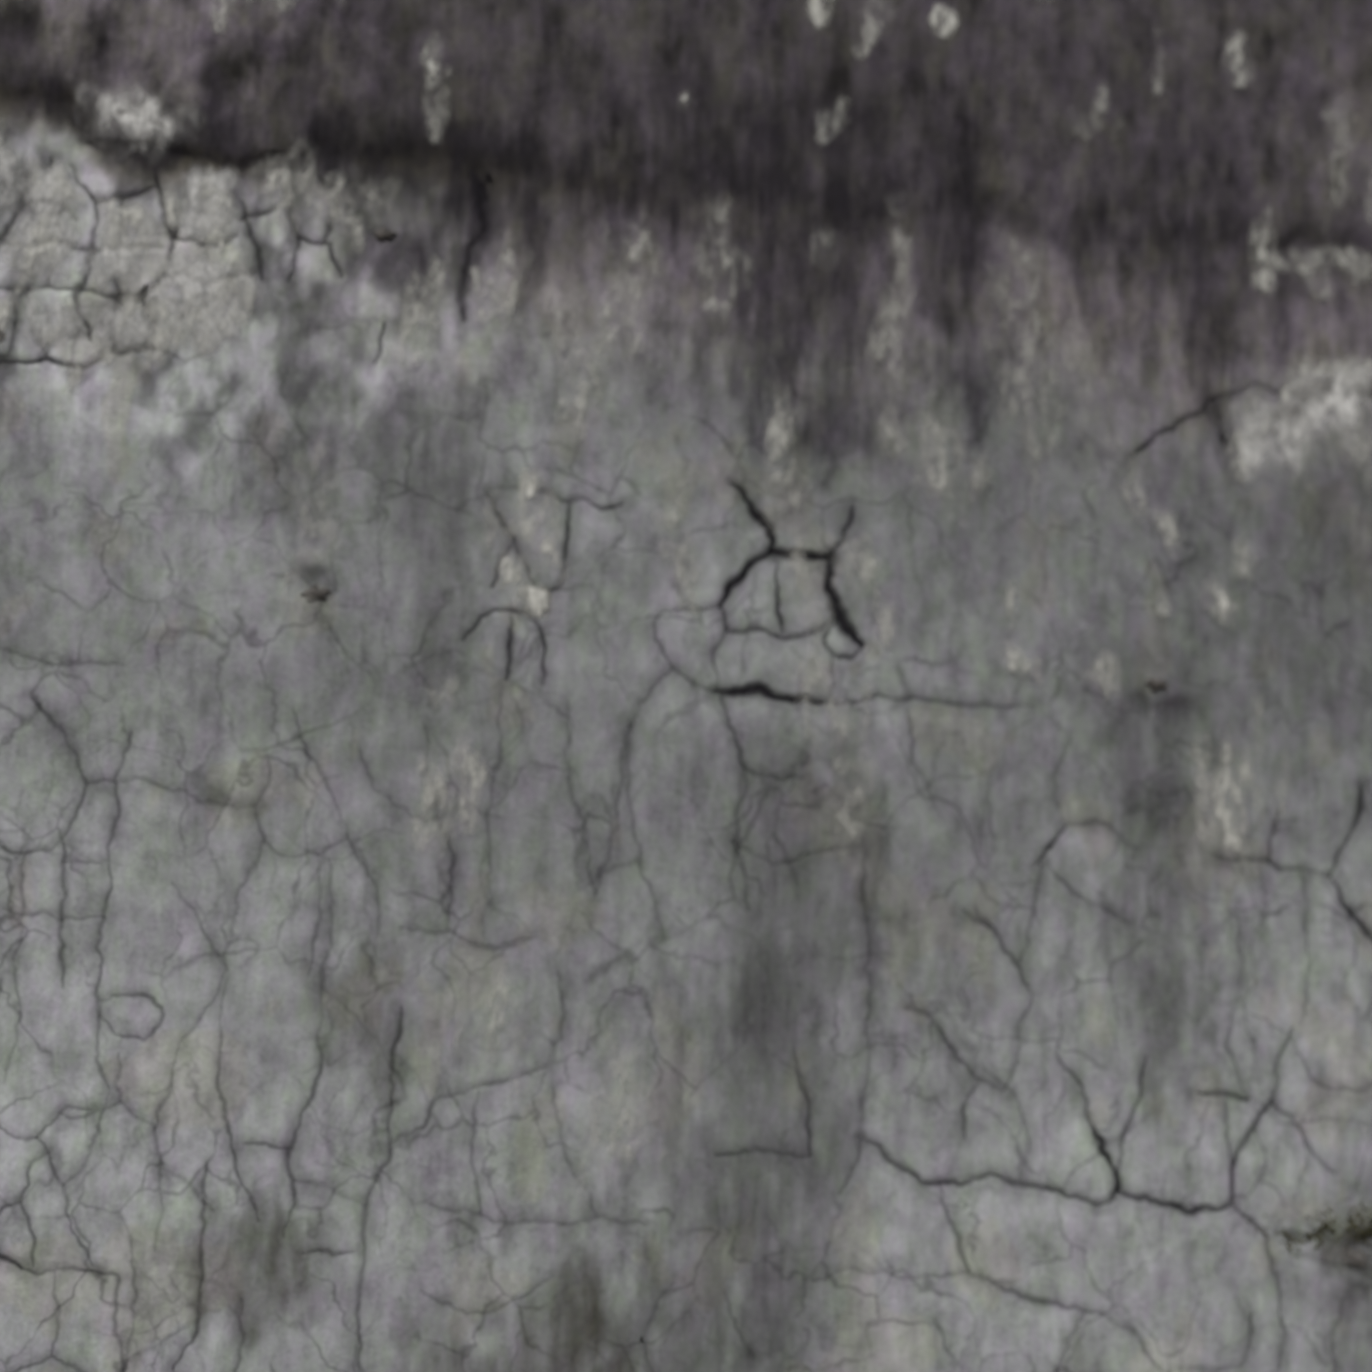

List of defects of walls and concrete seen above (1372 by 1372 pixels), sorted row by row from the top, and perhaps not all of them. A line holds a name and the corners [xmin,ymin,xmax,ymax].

damp [809,0,827,26]
damp [931,5,957,37]
damp [1227,37,1245,85]
damp [166,194,176,224]
crack [0,158,343,369]
damp [1253,230,1281,291]
crack [463,506,554,681]
crack [718,482,864,659]
damp [1213,588,1229,619]
crack [713,683,824,705]
crack [1087,1117,1236,1214]
crack [0,1255,23,1269]